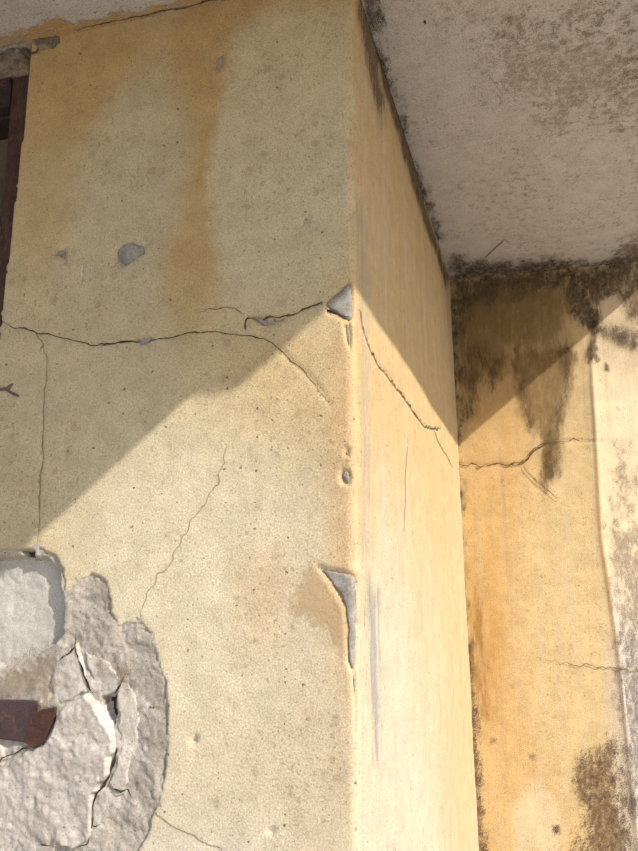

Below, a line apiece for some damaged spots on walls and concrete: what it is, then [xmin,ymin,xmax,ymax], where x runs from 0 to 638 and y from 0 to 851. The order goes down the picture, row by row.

flaking render [0,48,31,79]
damp [357,0,638,495]
corrosion [22,701,56,749]
flaking render [0,544,169,851]
crack [4,301,326,544]
crack [140,450,226,618]
crack [360,311,594,496]
damp [569,437,638,851]